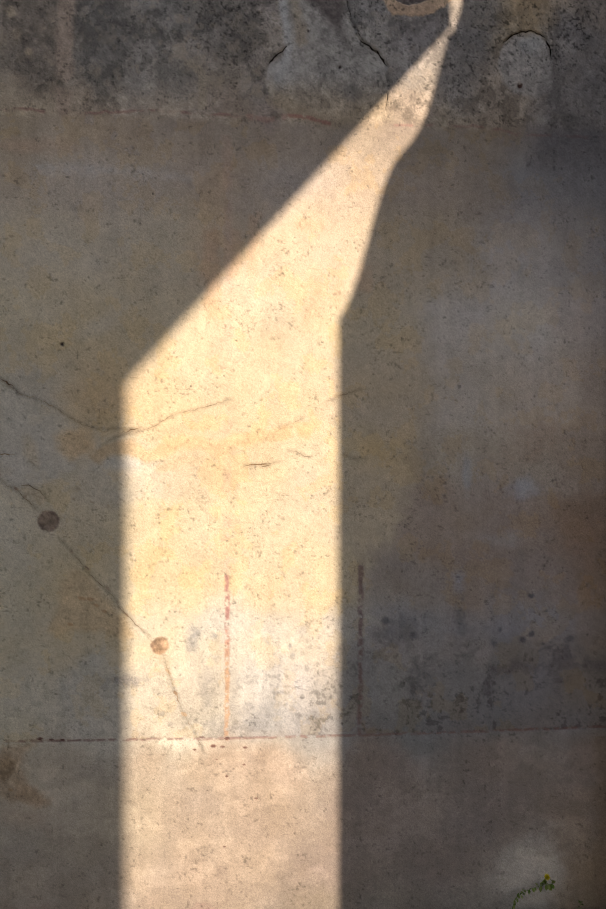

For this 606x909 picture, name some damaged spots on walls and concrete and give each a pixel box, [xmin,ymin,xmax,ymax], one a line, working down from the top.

damp [51,0,78,119]
damp [145,48,206,104]
crack [347,1,388,112]
crack [504,30,551,56]
crack [62,541,149,636]
crack [163,656,200,743]
peeling [192,736,231,761]